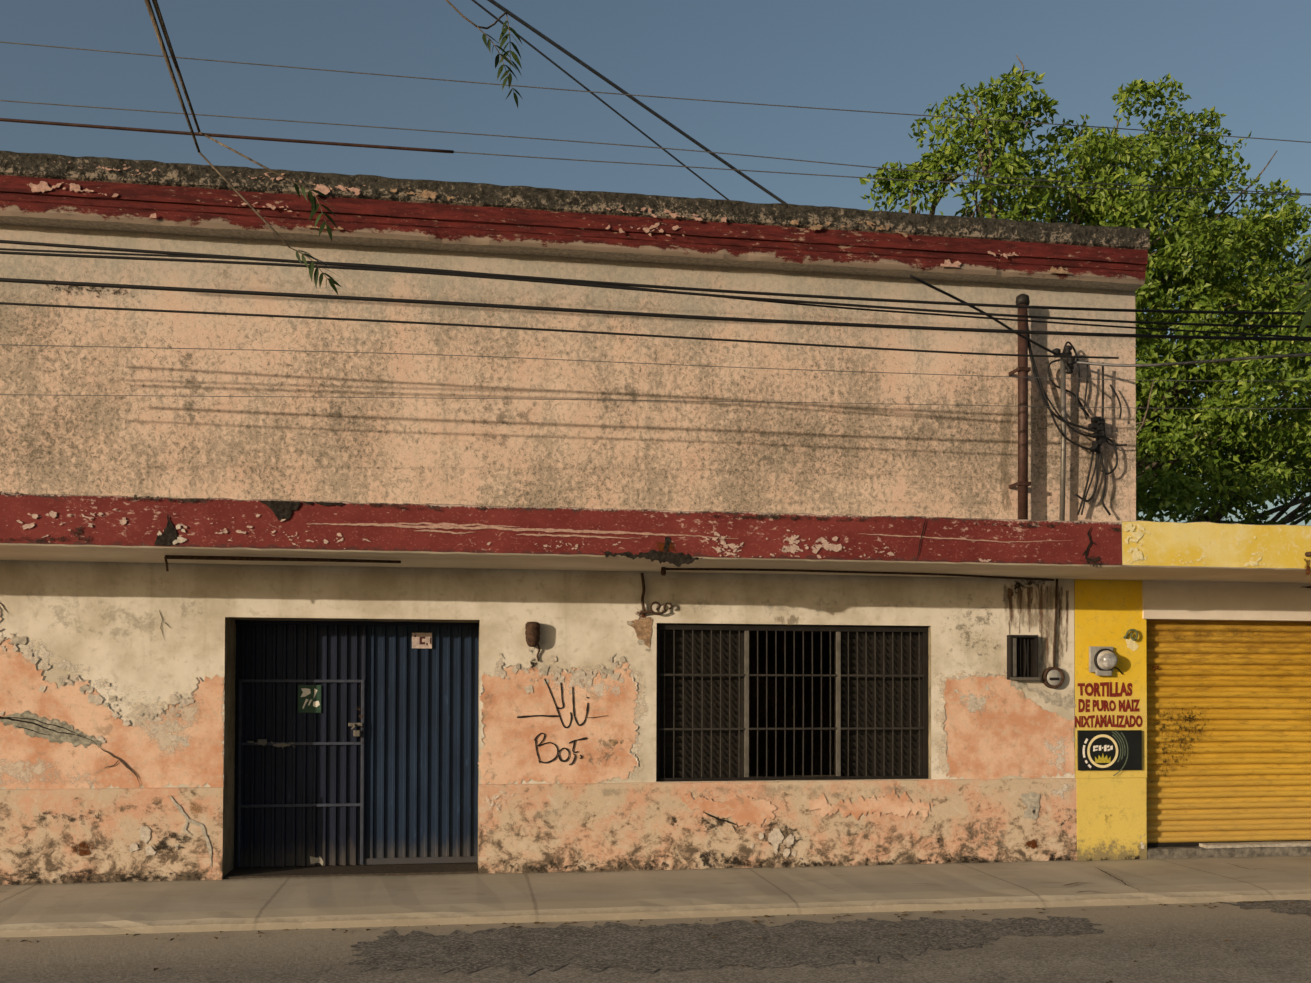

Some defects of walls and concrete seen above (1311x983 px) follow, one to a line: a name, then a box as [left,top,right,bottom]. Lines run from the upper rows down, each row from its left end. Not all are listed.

peeling [27,161,118,197]
peeling [232,171,365,196]
peeling [589,205,726,236]
spalling [210,500,345,549]
spalling [601,527,895,567]
peeling [0,610,224,789]
peeling [478,652,648,784]
crack [0,711,140,785]
peeling [935,671,1076,821]
crack [170,796,212,867]
leakage [700,817,738,833]
leakage [503,820,1073,873]